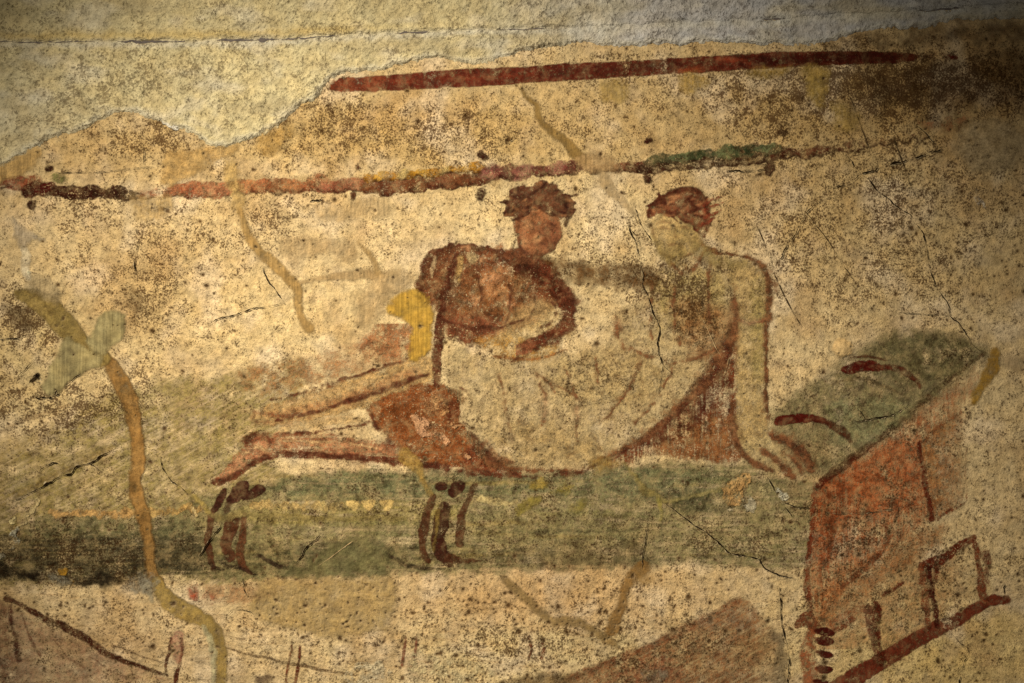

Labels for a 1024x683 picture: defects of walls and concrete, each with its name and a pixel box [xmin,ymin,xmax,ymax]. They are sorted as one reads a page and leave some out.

crack [522,91,678,393]
crack [771,126,982,352]
crack [13,208,406,683]
crack [626,455,793,683]